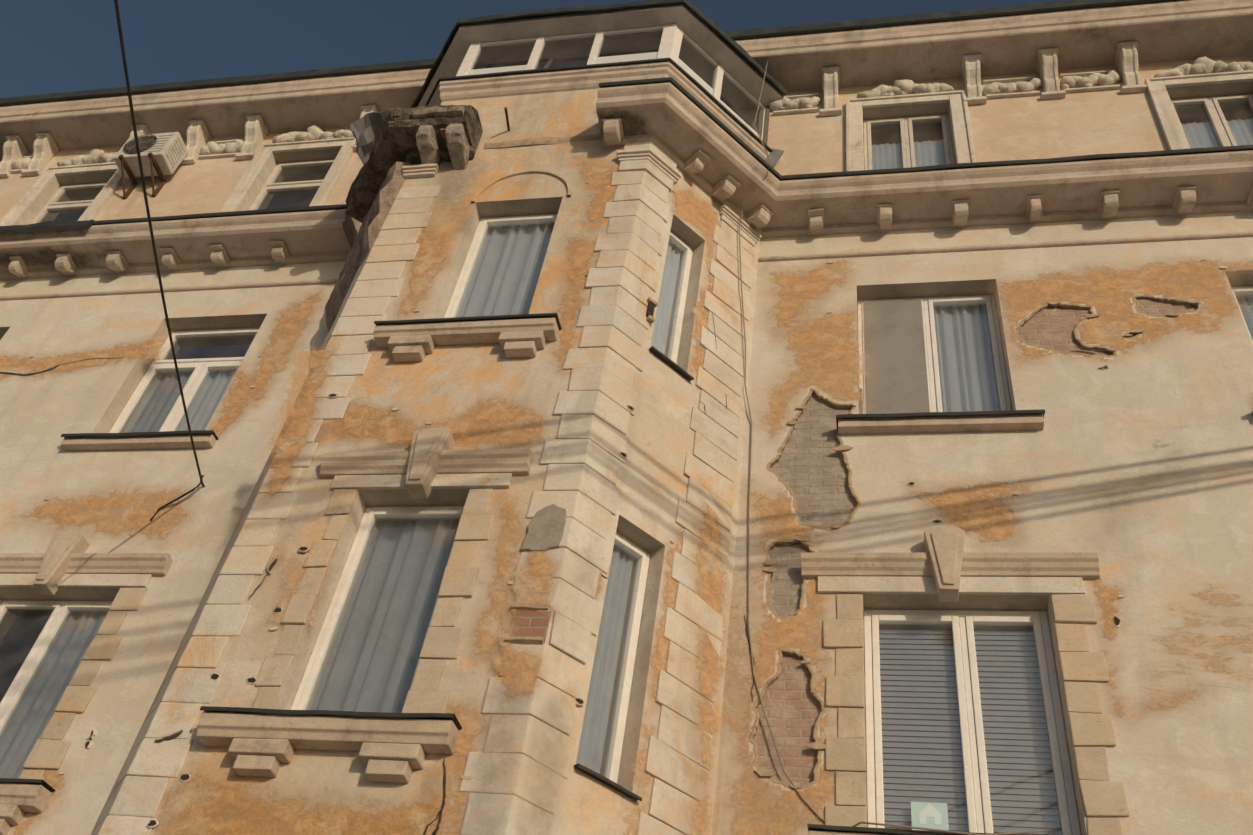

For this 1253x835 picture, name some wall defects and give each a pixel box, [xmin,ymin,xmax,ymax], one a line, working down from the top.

spalling [345,105,483,223]
crack [0,358,110,376]
peeling [212,293,543,495]
spalling [646,297,658,323]
peeling [999,259,1253,370]
peeling [26,489,186,540]
spalling [743,259,868,824]
peeling [907,481,1030,543]
peeling [473,504,558,698]
peeling [689,506,728,835]
crack [744,615,755,703]
crack [423,759,446,835]